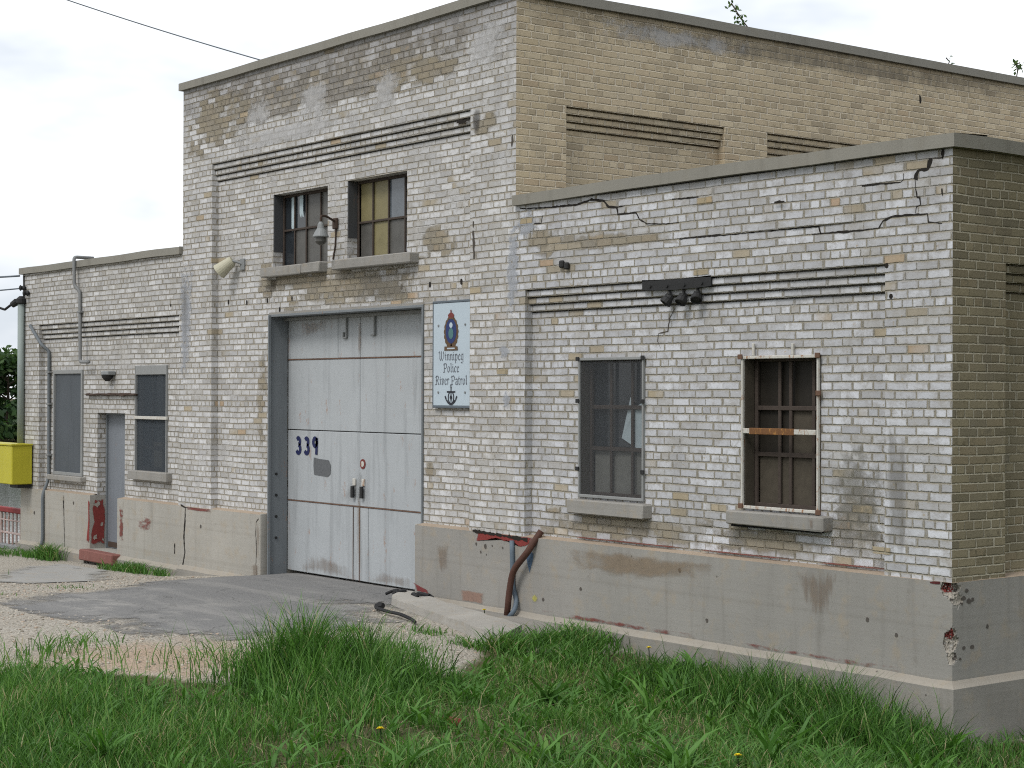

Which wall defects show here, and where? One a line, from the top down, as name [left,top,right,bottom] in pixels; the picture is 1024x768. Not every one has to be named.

crack [519,148,944,240]
spalling [86,501,104,541]
crack [174,504,192,565]
spalling [472,529,531,555]
water stain [605,555,684,575]
spalling [930,581,974,606]
spalling [943,628,974,665]